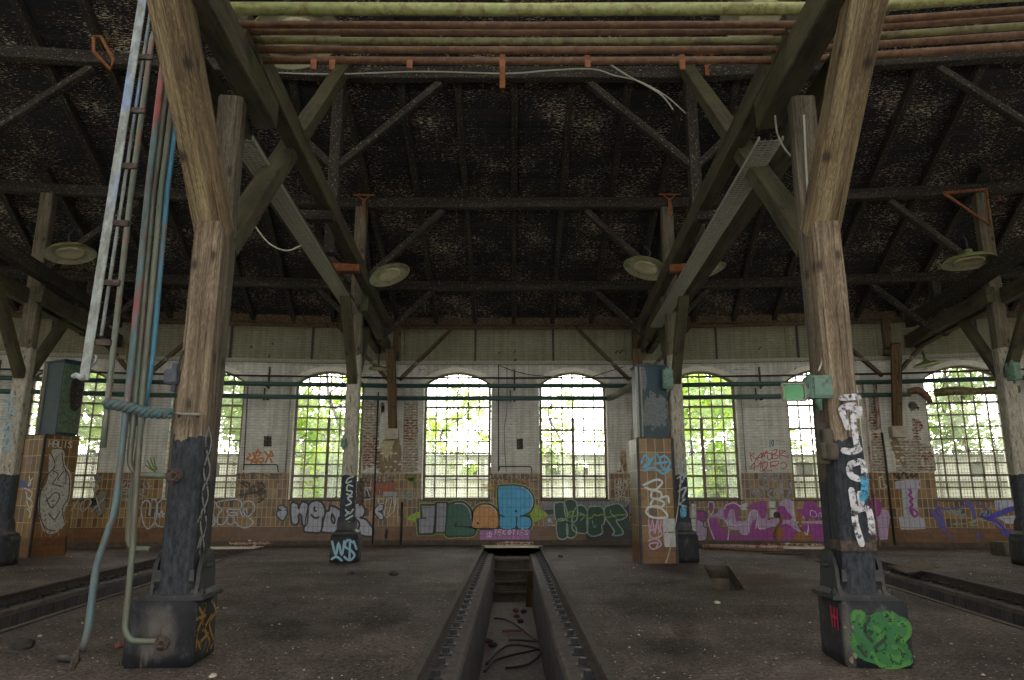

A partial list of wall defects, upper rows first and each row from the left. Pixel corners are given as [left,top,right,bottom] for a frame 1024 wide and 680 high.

peeling [362,400,420,472]
peeling [868,391,936,473]